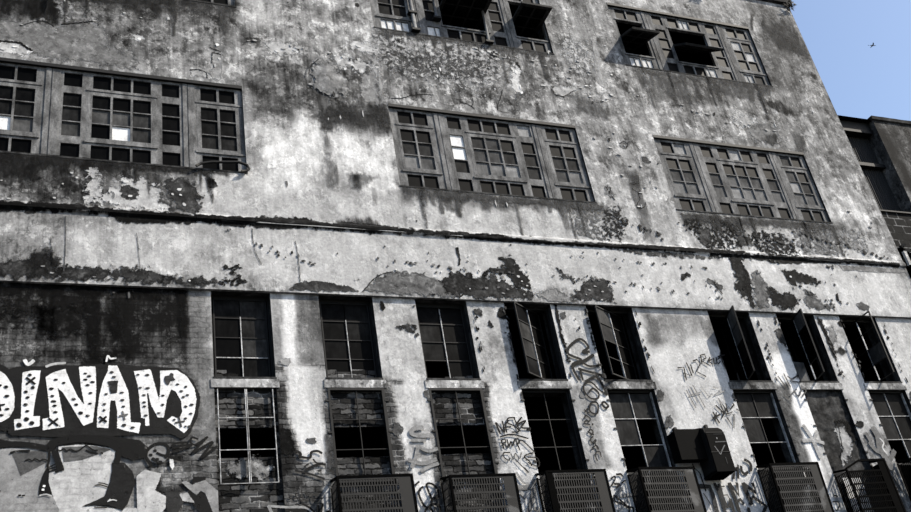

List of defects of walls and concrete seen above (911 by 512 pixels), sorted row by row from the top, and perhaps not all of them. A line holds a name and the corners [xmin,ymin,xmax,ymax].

peeling [0,0,140,70]
peeling [70,167,218,215]
damp [319,103,392,190]
damp [0,166,900,268]
damp [0,247,248,358]
peeling [290,247,617,379]
peeling [567,186,906,377]